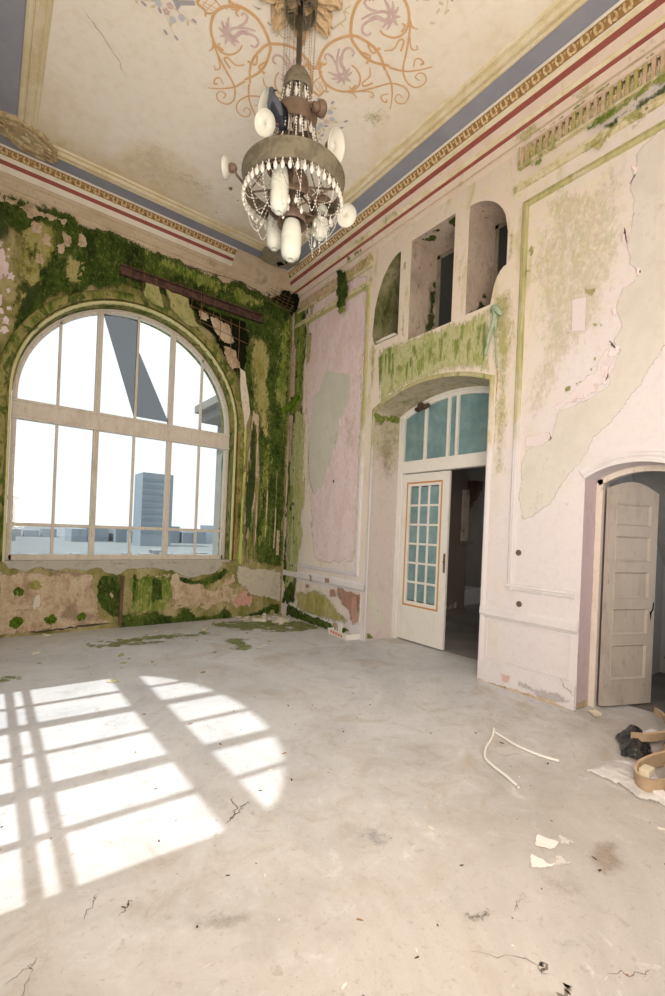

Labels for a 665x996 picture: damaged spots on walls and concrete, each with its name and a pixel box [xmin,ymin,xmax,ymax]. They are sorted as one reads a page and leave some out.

flaking render [0,194,87,265]
flaking render [519,128,665,519]
peeling [268,276,367,563]
damp [243,411,284,568]
flaking render [0,572,108,635]
flaking render [156,566,281,611]
peeling [325,578,359,625]
crack [228,796,250,822]
crack [7,957,39,996]